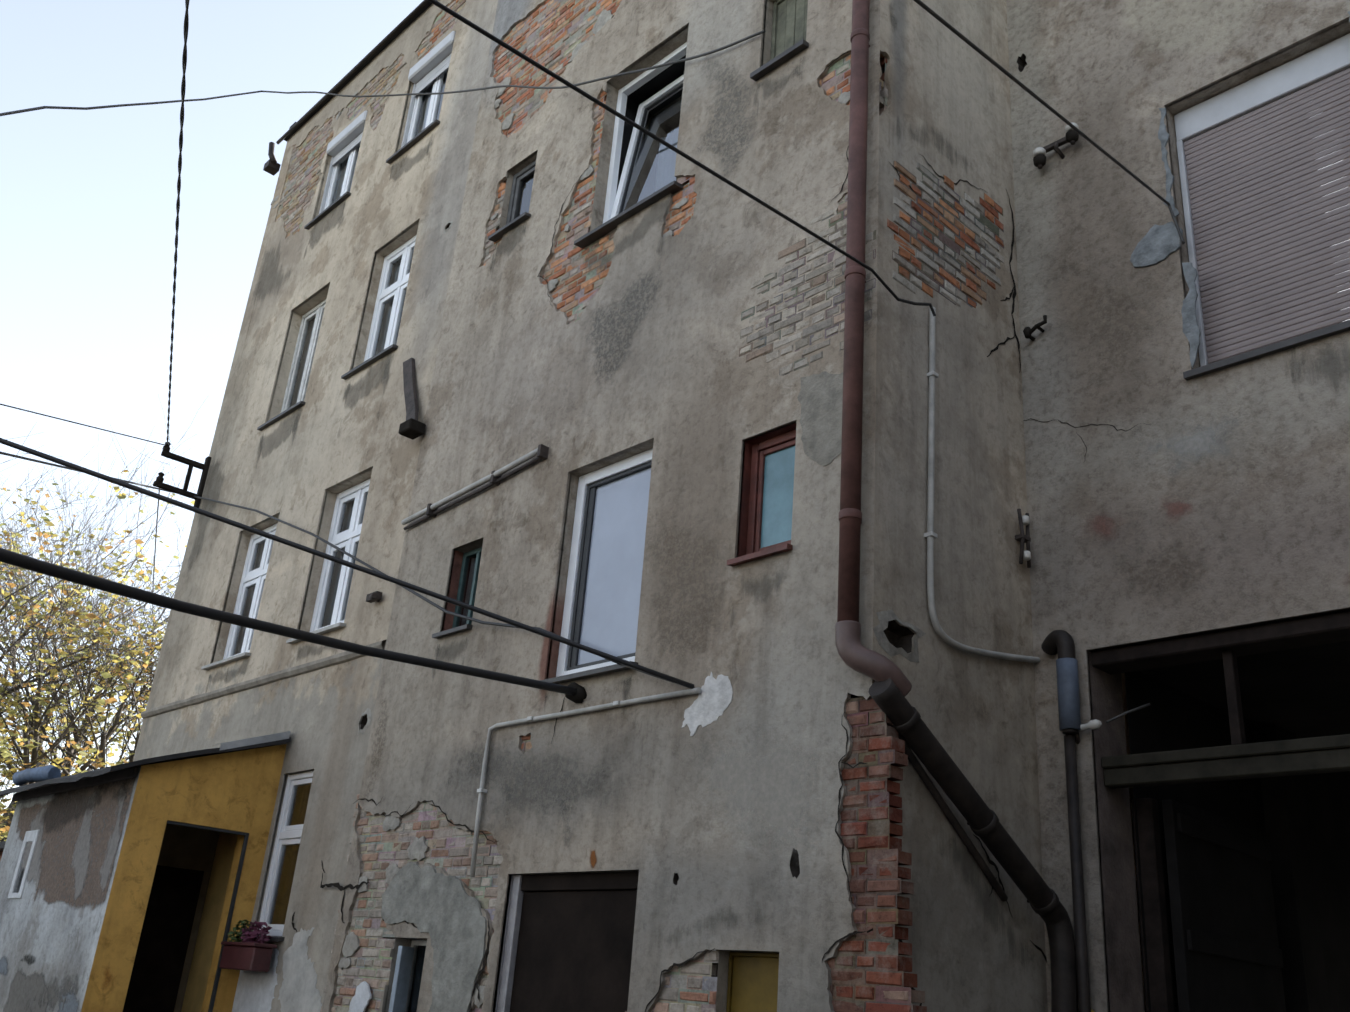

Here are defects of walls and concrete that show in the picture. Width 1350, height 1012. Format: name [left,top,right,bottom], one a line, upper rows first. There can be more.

flaking render [492,0,622,137]
flaking render [537,91,617,324]
flaking render [663,177,697,237]
flaking render [739,146,849,376]
flaking render [864,154,1005,322]
crack [1023,418,1149,462]
spalling [873,610,926,663]
water stain [22,806,47,890]
water stain [71,787,127,900]
flaking render [232,794,503,1012]
flaking render [822,697,927,1012]
flaking render [645,948,719,1012]